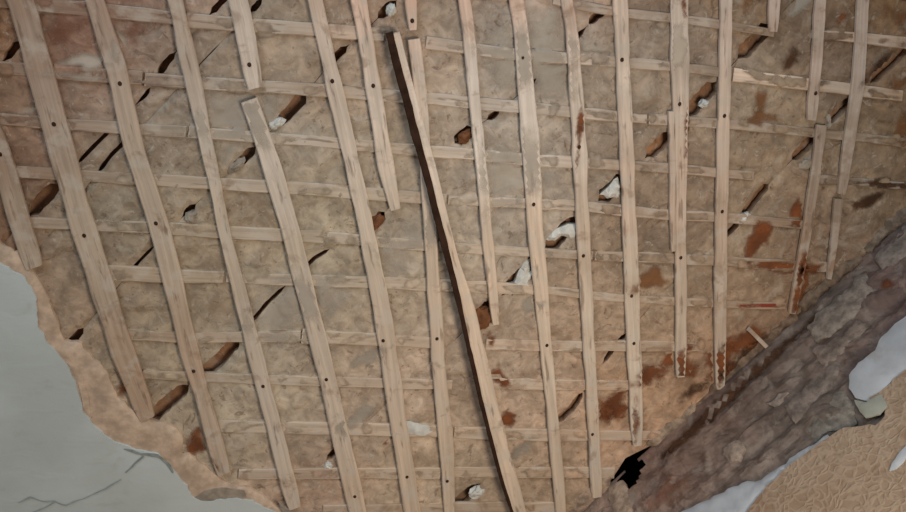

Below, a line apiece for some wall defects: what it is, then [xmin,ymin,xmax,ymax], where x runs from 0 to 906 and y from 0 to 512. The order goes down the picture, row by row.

rust [750,93,776,124]
rust [790,199,802,227]
rust [635,268,667,292]
rust [745,221,820,313]
flaking render [0,240,291,512]
flaking render [406,420,433,436]
rust [599,391,639,434]
peeling [854,394,888,418]
peeling [889,446,906,471]
crack [18,449,174,512]